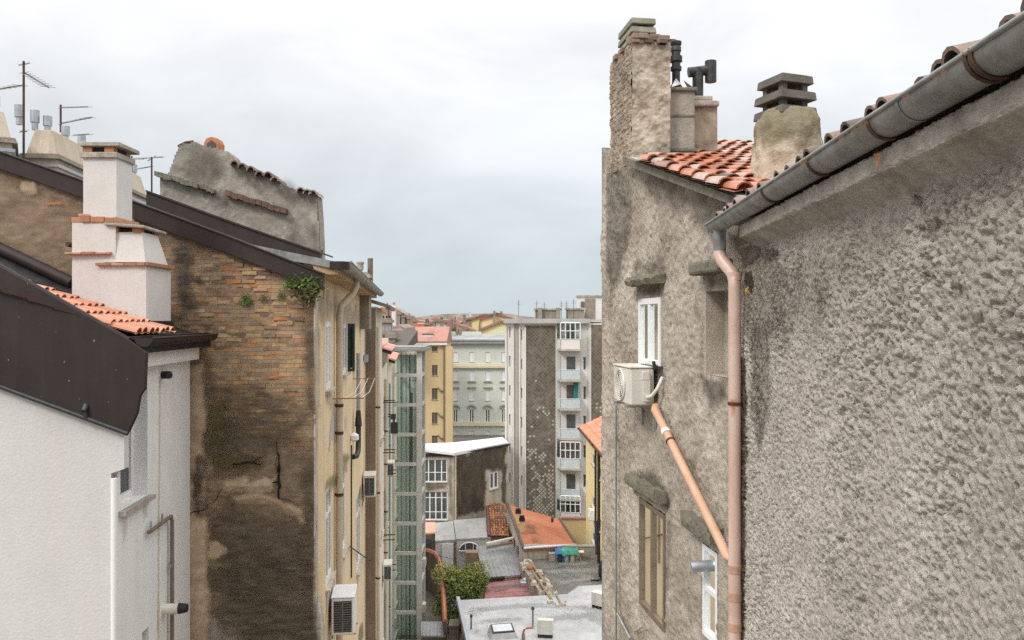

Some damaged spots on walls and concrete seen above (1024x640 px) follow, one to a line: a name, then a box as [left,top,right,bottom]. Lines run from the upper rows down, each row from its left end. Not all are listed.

damp [193,391,320,640]
crack [232,441,299,506]